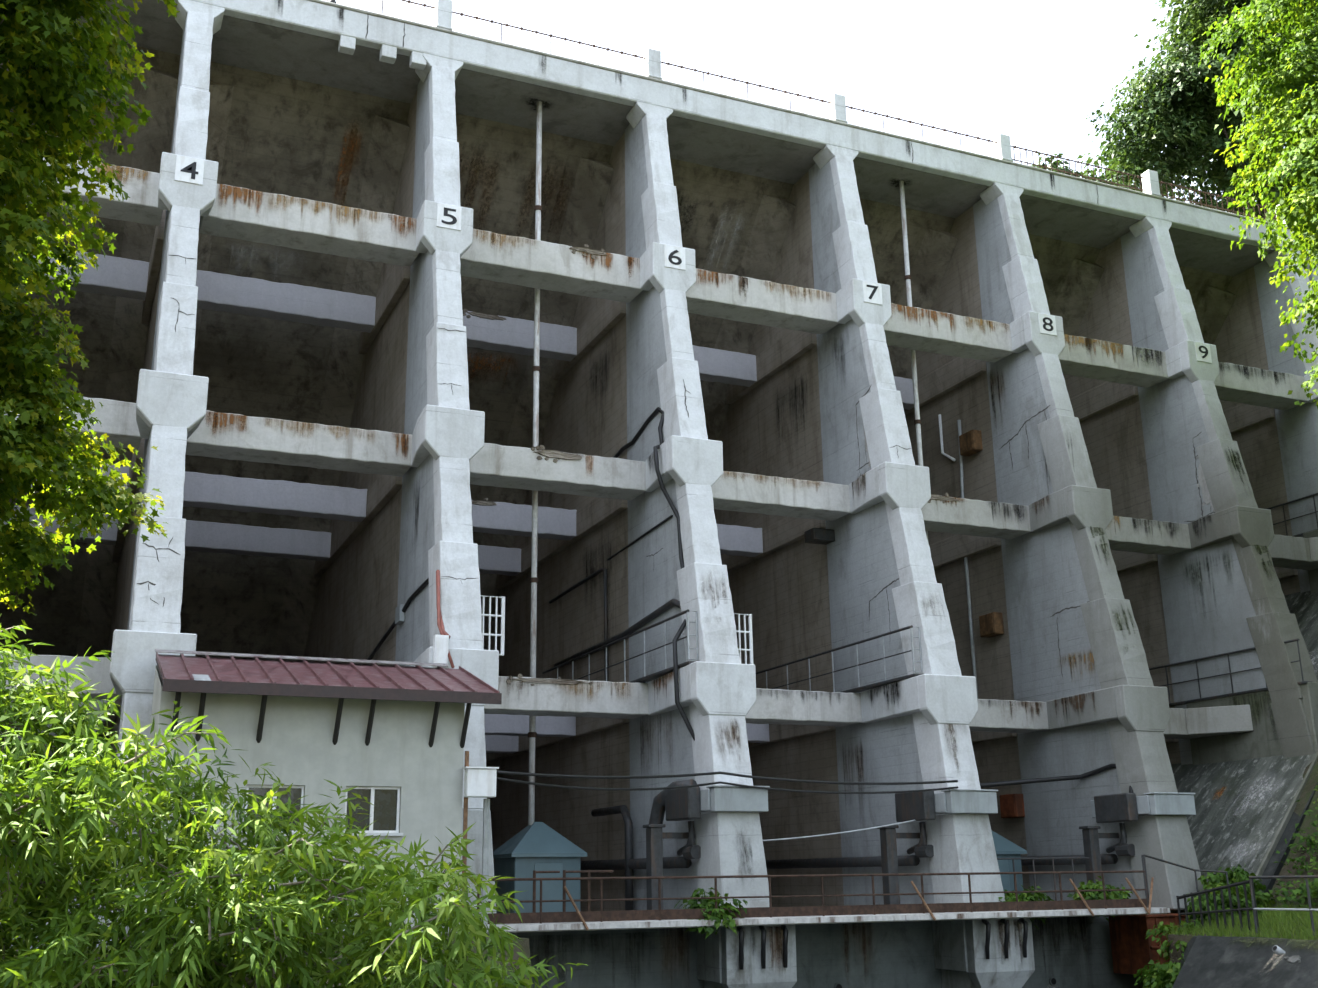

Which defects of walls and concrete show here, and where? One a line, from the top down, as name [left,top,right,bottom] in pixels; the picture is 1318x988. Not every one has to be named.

rust [219,184,416,233]
rust [581,252,612,269]
rust [698,269,748,295]
rust [891,304,1006,330]
rust [1064,334,1123,356]
rust [209,412,246,430]
rust [394,433,408,455]
crack [1000,405,1050,470]
crack [137,538,180,606]